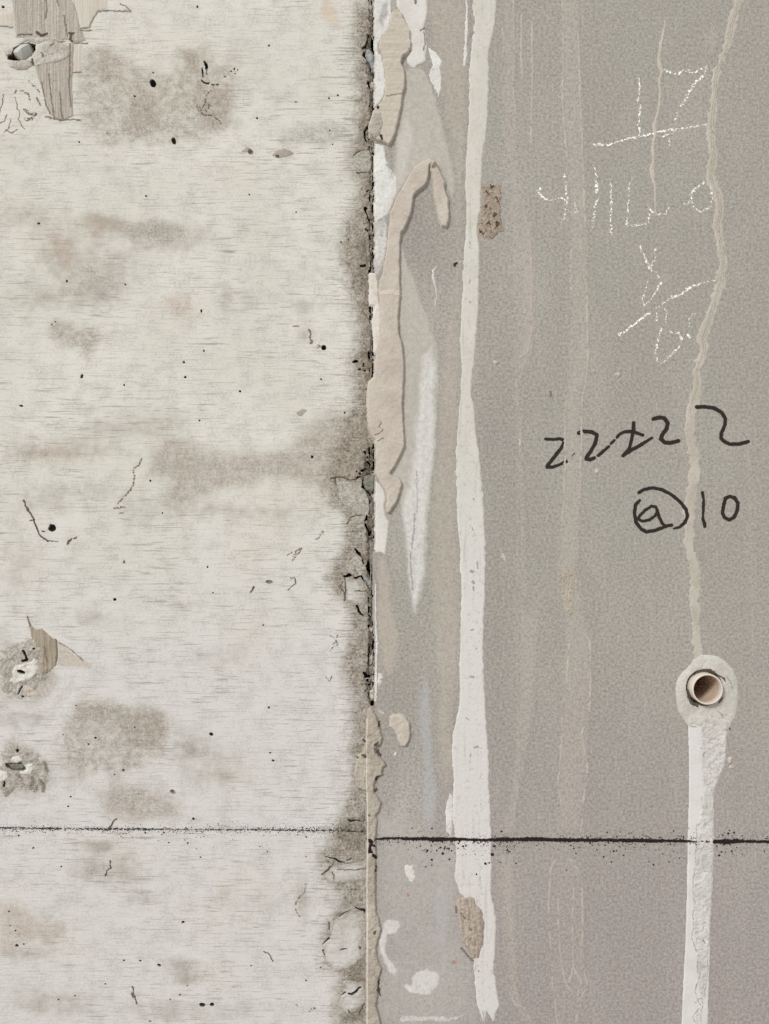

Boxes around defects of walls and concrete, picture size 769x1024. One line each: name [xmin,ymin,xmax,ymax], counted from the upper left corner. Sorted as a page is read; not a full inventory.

peeling [0,31,74,142]
water stain [70,36,257,160]
water stain [134,0,440,1024]
spalling [0,615,94,699]
spalling [0,743,50,797]
water stain [0,632,194,893]
peeling [322,907,381,1014]